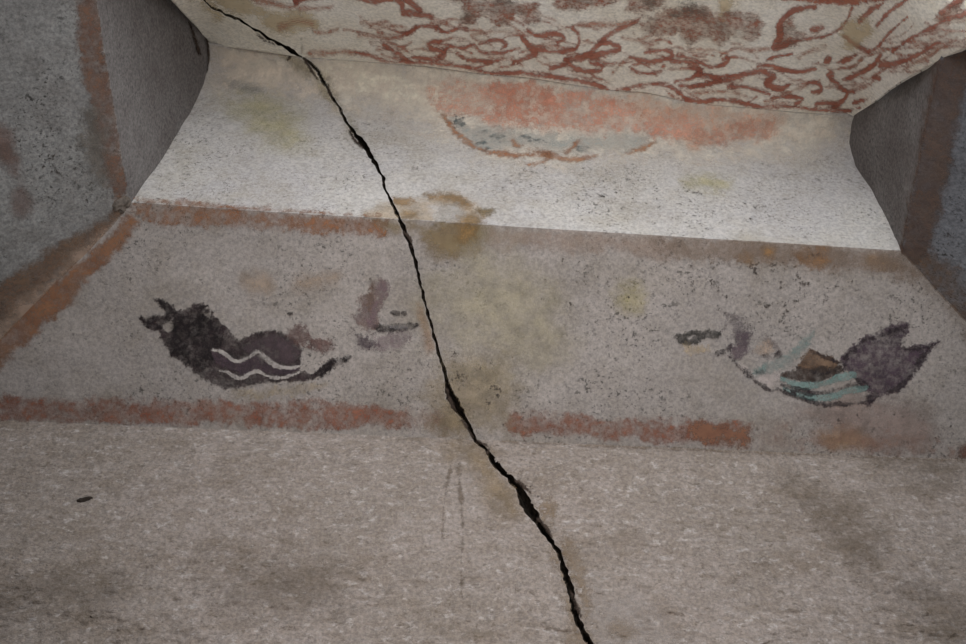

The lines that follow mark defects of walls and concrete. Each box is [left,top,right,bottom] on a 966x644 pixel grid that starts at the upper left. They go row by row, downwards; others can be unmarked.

crack [188,22,210,71]
leakage [387,156,538,258]
crack [204,0,620,644]